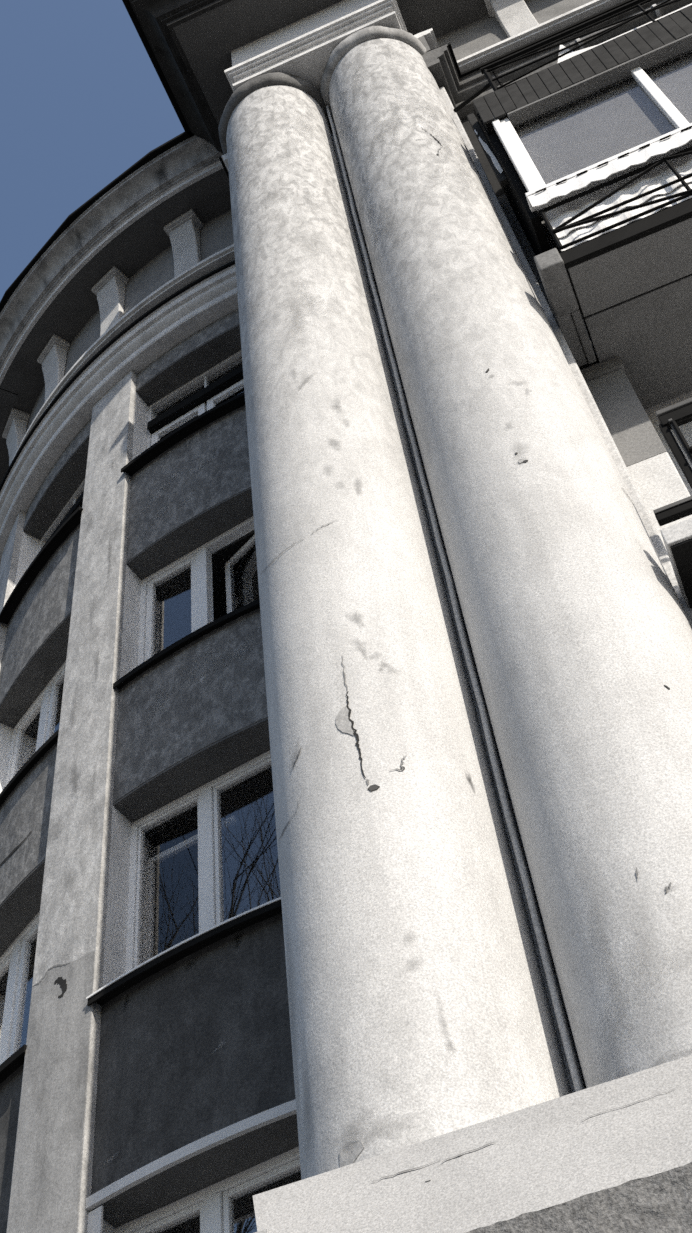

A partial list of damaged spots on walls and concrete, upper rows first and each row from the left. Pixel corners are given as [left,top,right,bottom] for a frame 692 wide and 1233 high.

crack [336,656,405,792]
spalling [54,977,67,998]